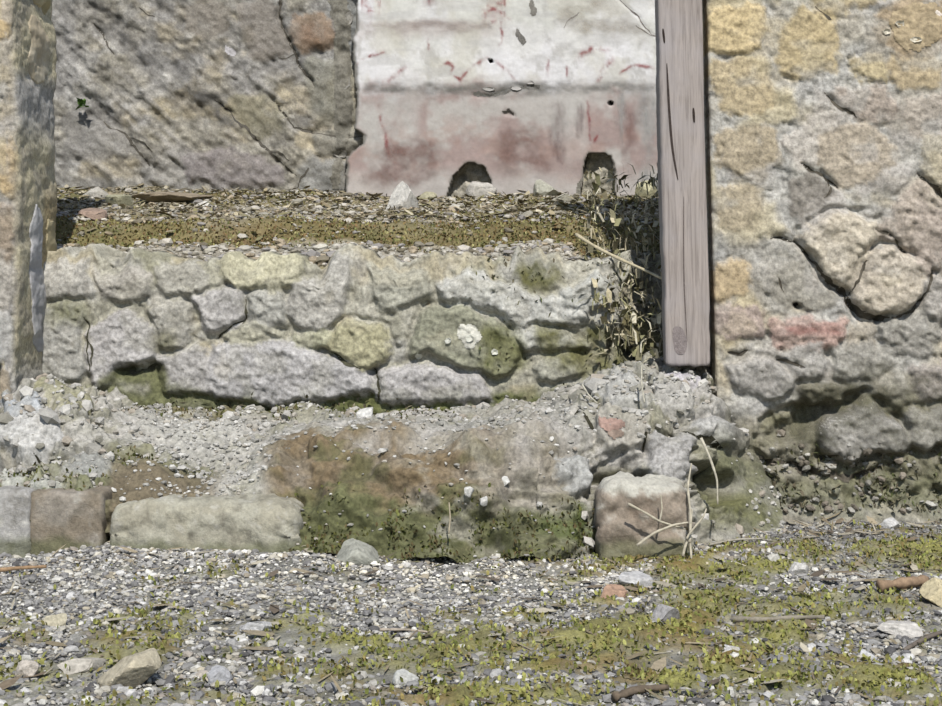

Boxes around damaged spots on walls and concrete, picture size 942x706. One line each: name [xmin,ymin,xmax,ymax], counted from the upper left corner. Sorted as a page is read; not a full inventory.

flaking render [328,0,353,189]